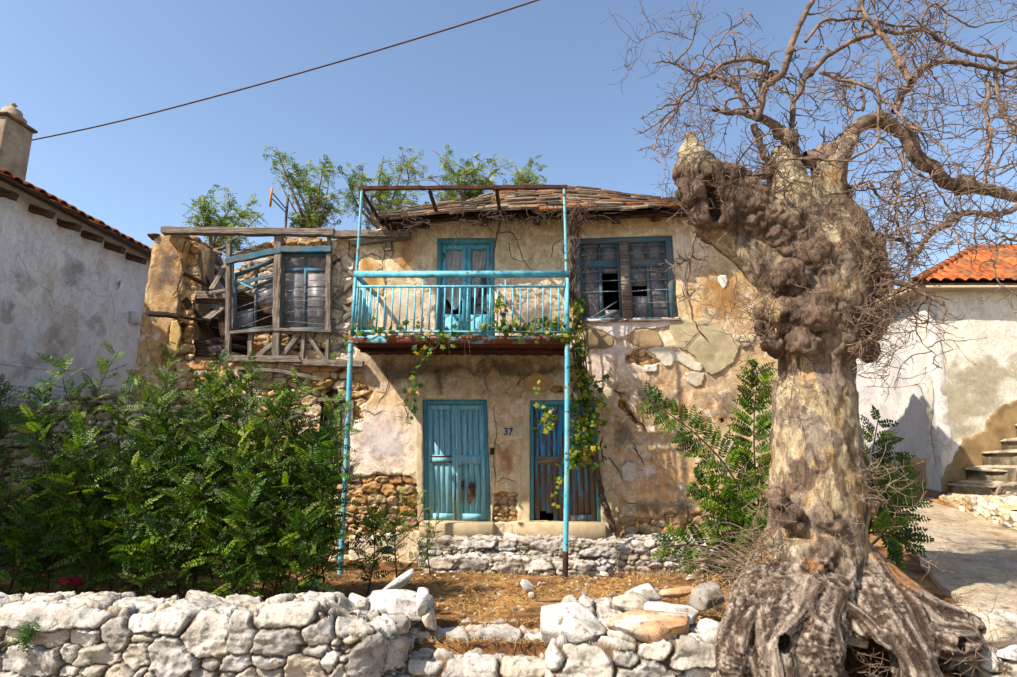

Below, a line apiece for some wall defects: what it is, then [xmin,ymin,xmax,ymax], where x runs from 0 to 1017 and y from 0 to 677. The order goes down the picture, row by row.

spalling [162,235,223,388]
flaking render [625,349,659,368]
flaking render [346,471,423,535]
flaking render [492,491,518,522]
crack [600,390,646,504]
water stain [927,356,1017,488]